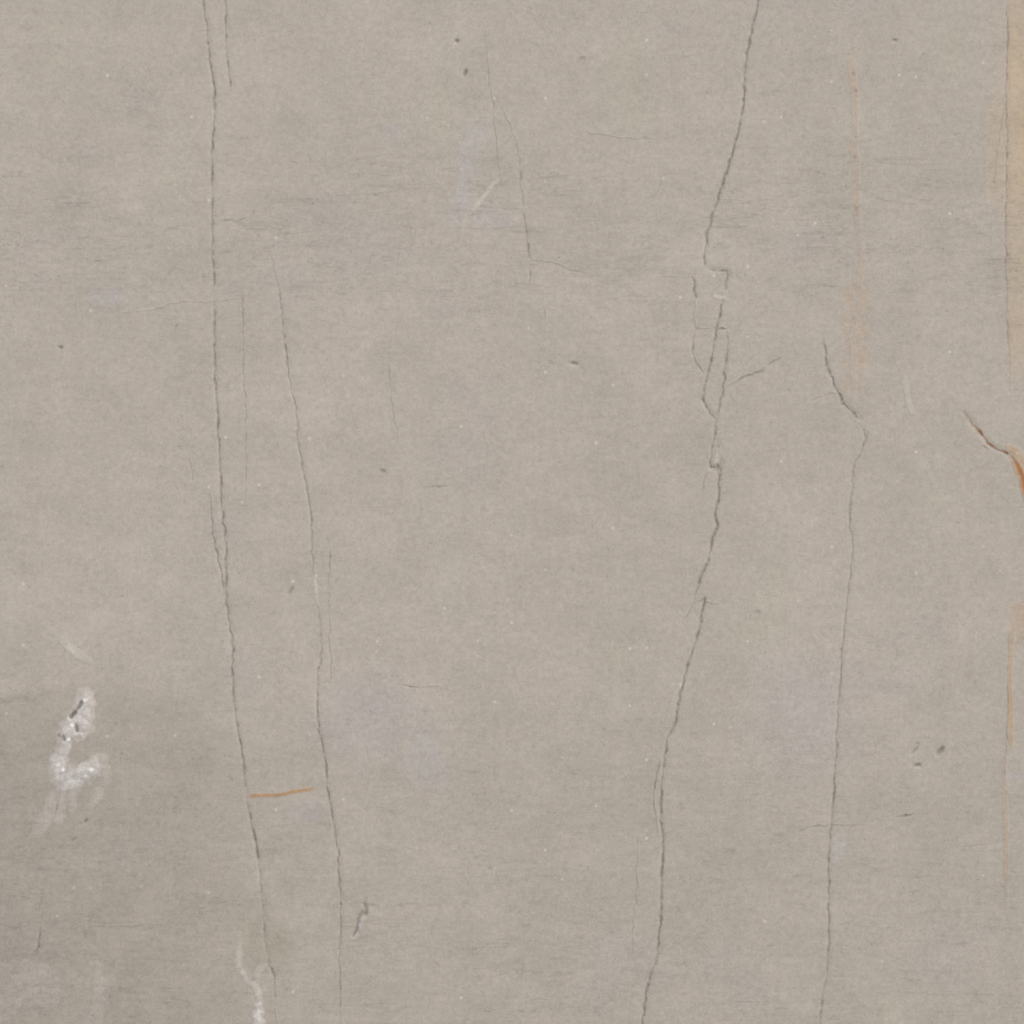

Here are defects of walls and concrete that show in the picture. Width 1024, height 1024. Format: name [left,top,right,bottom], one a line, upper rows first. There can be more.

damp [0,636,303,1024]
crack [189,0,279,1024]
corrosion [245,786,317,798]
crack [271,253,343,1024]
crack [640,0,785,1024]
crack [796,335,869,1024]
corrosion [1005,443,1024,502]